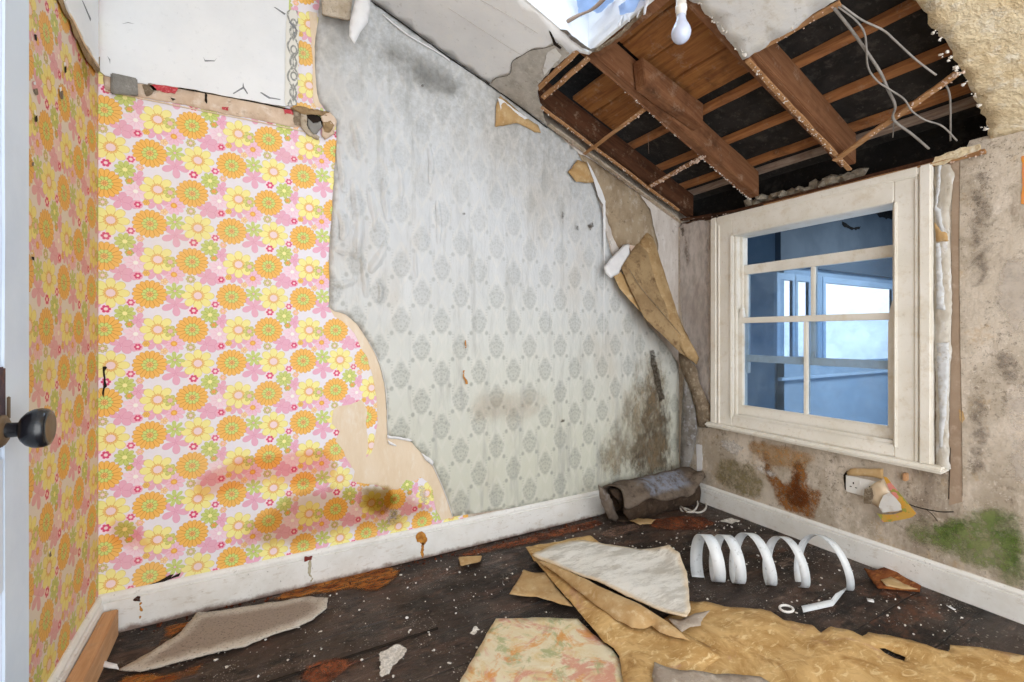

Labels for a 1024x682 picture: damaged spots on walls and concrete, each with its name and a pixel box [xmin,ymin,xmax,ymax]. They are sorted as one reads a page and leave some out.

flaking render [58,0,337,140]
peeling [330,309,453,520]
peeling [568,145,699,365]
leakage [606,220,711,474]
rust [765,463,821,517]
spalling [876,210,893,219]